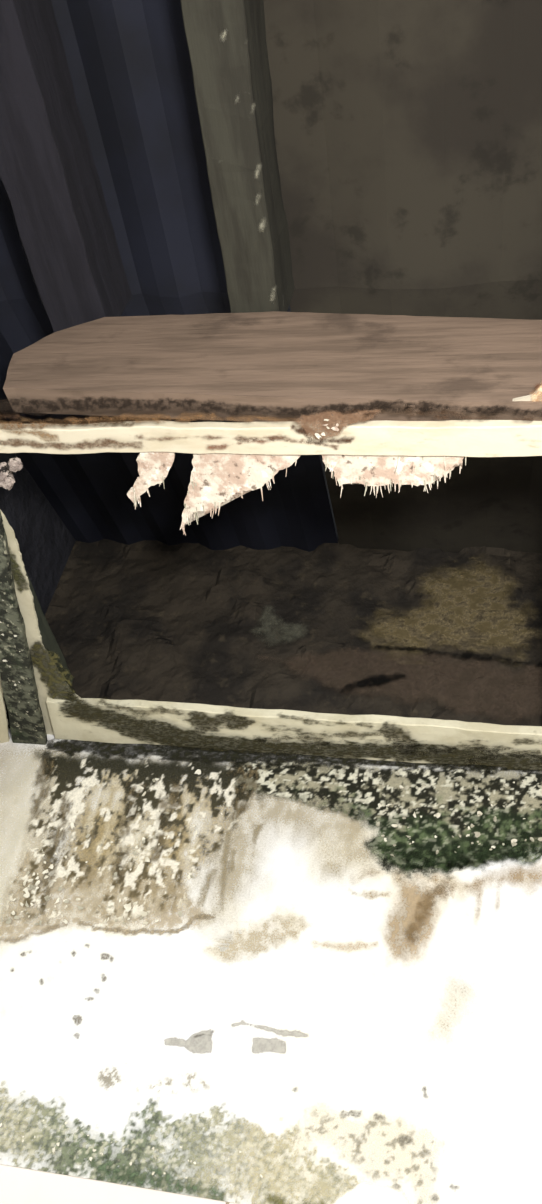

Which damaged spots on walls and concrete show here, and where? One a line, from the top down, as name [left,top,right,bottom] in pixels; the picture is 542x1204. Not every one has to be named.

leakage [9,548,29,592]
leakage [0,642,542,959]
peeling [0,853,214,942]
peeling [165,1029,213,1053]
peeling [252,1038,286,1053]
leakage [99,1069,119,1088]
leakage [0,1088,438,1204]